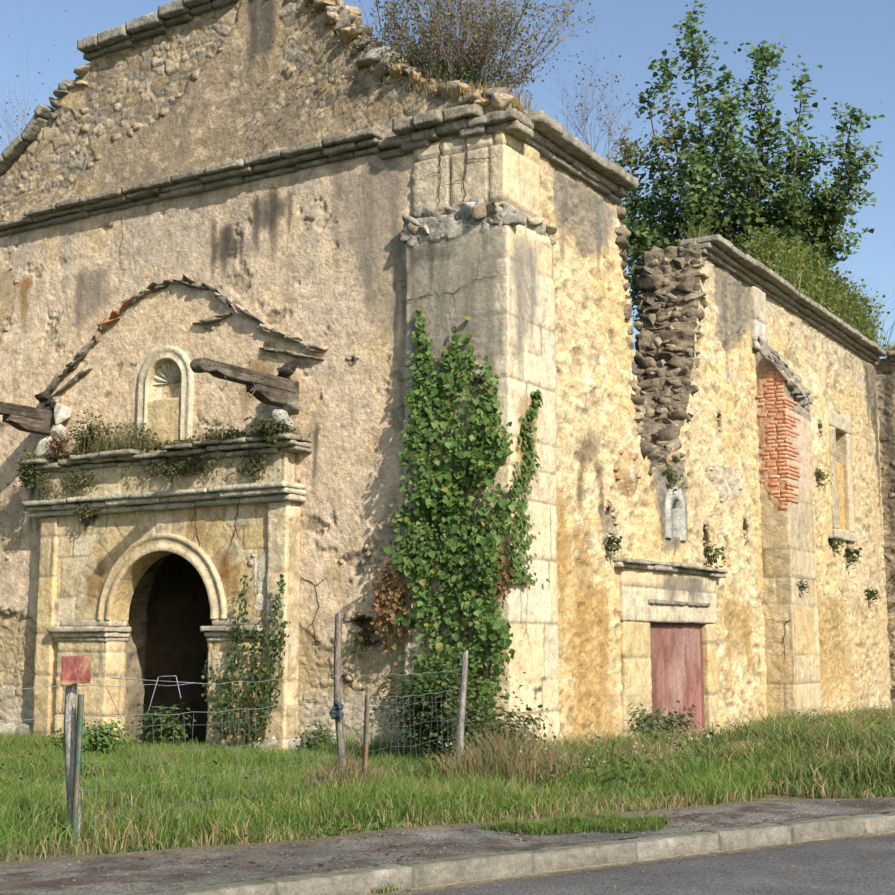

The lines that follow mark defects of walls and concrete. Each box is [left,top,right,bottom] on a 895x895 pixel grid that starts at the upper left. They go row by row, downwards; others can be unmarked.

crack [422,139,493,207]
leakage [213,228,243,260]
leakage [254,198,291,239]
crack [405,262,497,311]
spalling [755,370,801,511]
crack [302,577,323,654]
spalling [0,604,36,728]